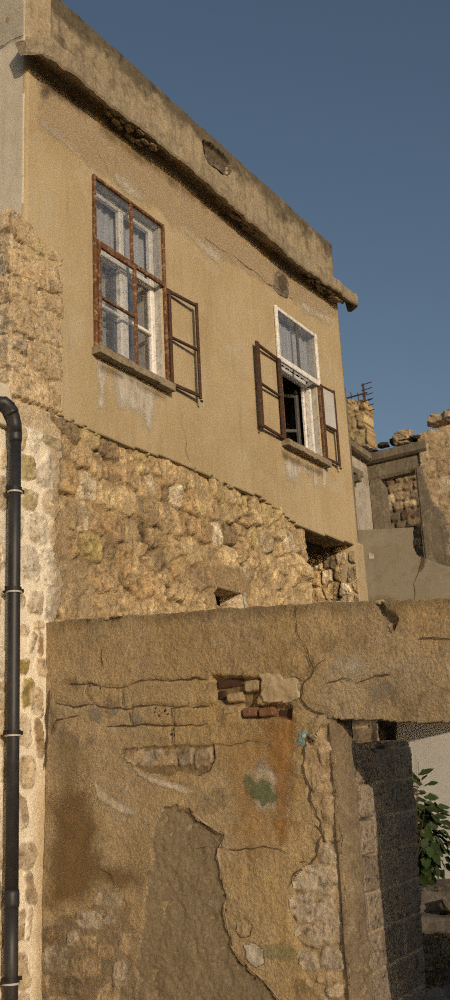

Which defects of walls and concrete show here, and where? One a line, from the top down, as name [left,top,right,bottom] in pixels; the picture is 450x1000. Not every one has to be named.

peeling [40,81,343,324]
water stain [97,361,157,429]
crack [292,607,395,715]
water stain [48,794,132,905]
flaking render [94,728,215,814]
flaking render [41,805,280,1000]
crack [183,735,322,888]
flaking render [254,765,280,810]
flaking render [289,724,349,1000]